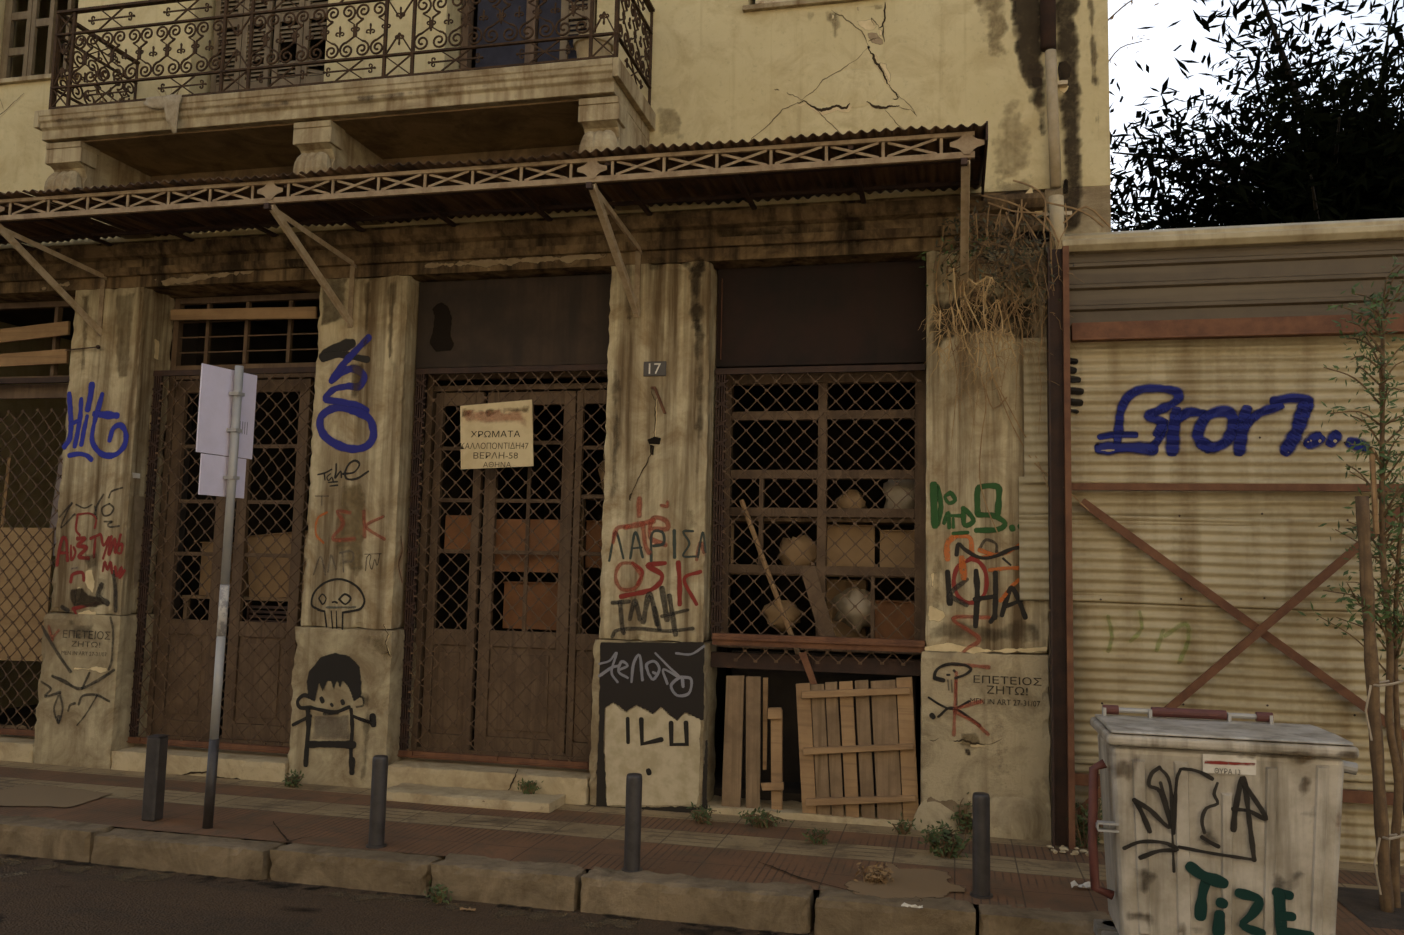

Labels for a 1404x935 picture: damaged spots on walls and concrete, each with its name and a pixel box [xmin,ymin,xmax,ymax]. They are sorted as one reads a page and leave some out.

crack [750,2,917,141]
leakage [978,0,1096,230]